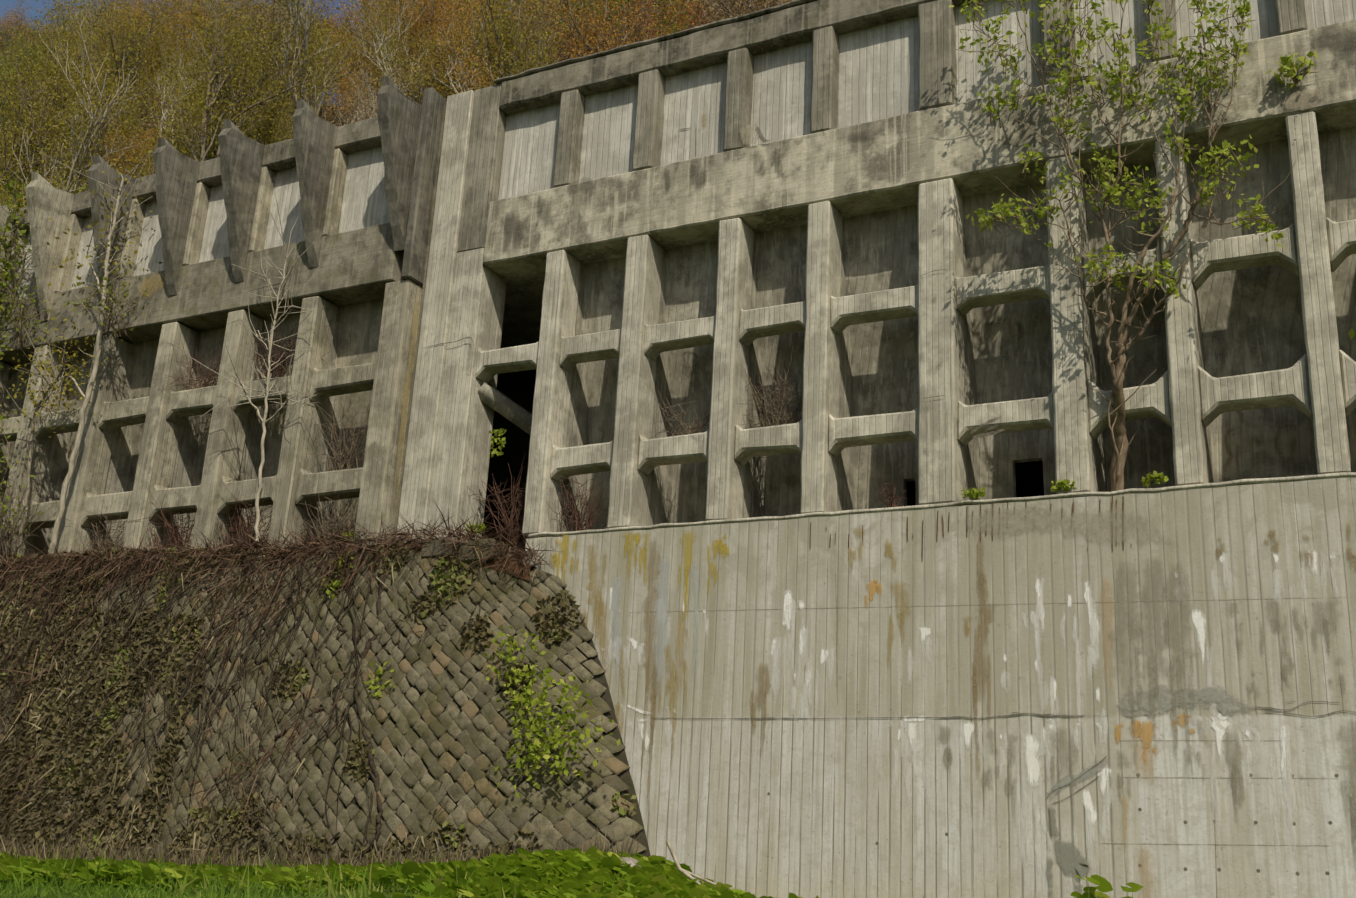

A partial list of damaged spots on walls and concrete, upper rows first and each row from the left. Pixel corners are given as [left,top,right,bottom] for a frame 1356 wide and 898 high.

water stain [553,533,729,686]
corrosion [865,580,904,605]
water stain [617,705,676,801]
water stain [959,721,982,782]
water stain [1018,579,1111,894]
corrosion [1115,720,1156,759]
water stain [1174,573,1260,827]
water stain [1271,727,1296,849]